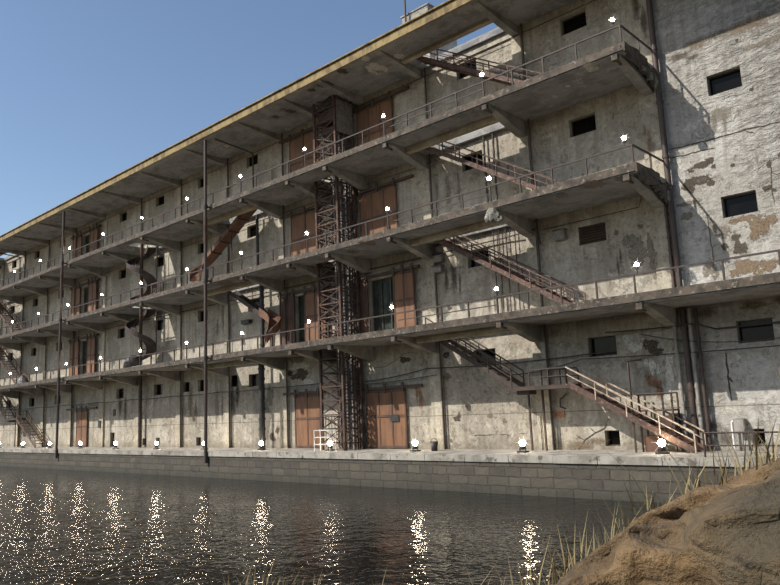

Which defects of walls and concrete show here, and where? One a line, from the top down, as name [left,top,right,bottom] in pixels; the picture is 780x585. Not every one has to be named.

spalling [638,157,716,220]
peeling [614,224,658,279]
peeling [702,213,779,280]